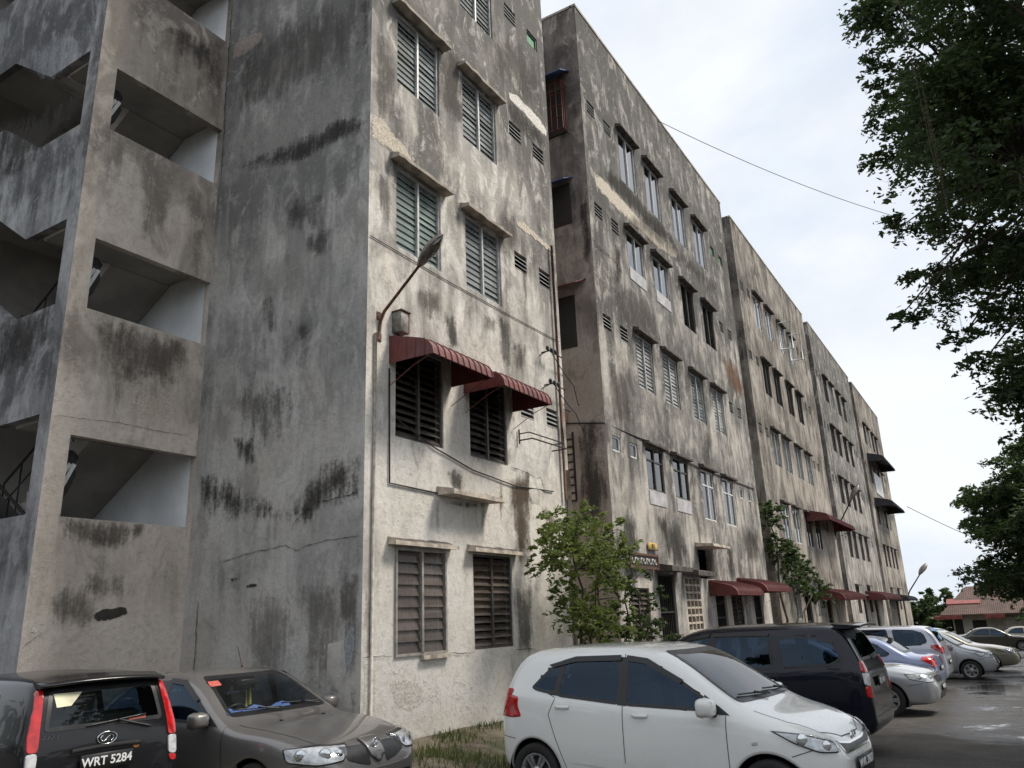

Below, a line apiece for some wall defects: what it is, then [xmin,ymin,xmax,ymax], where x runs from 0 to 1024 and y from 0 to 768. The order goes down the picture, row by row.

leakage [259,119,361,165]
peeling [372,115,411,160]
spalling [509,93,547,136]
leakage [99,326,180,377]
leakage [238,440,253,463]
leakage [201,476,271,516]
leakage [295,463,357,521]
leakage [78,523,121,545]
crack [224,490,358,562]
leakage [514,592,531,652]